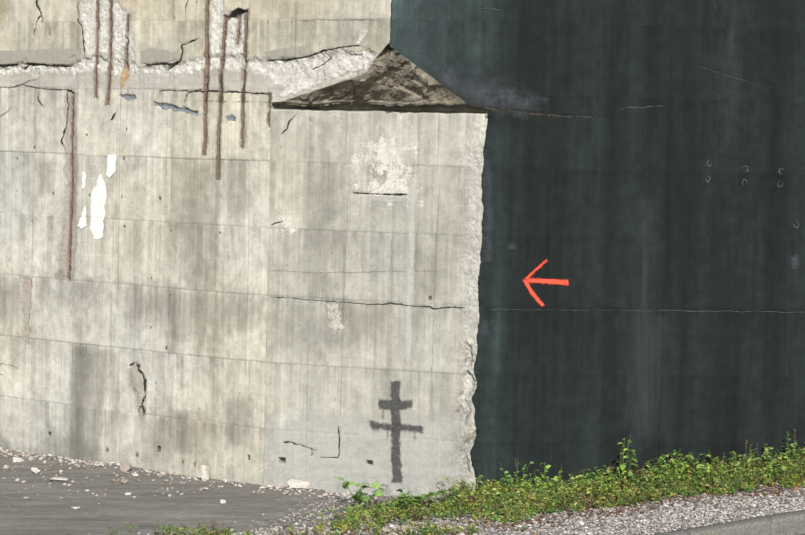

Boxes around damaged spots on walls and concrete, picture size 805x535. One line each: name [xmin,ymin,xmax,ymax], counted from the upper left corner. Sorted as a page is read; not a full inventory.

crack [0,1,86,147]
spalling [0,0,378,179]
spalling [55,90,125,280]
crack [130,362,147,416]
crack [272,137,464,458]
spalling [451,151,491,477]